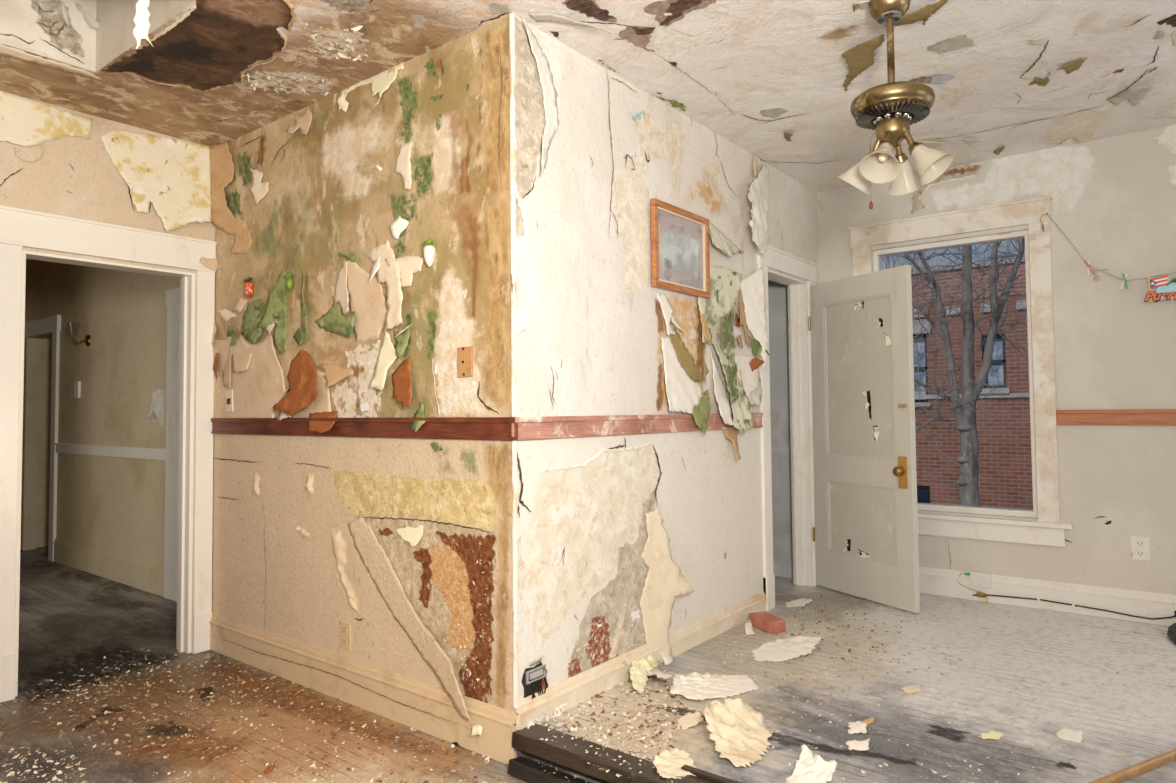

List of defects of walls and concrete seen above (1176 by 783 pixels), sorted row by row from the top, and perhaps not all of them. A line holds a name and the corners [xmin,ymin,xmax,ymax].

peeling [31,0,85,58]
flaking render [562,0,717,52]
spalling [101,0,384,207]
peeling [429,110,463,197]
flaking render [489,3,546,239]
flaking render [910,164,983,214]
crack [920,40,1171,140]
flaking render [614,113,734,425]
peeling [278,324,412,420]
peeling [432,267,488,417]
peeling [331,440,657,708]
peeling [518,701,569,730]